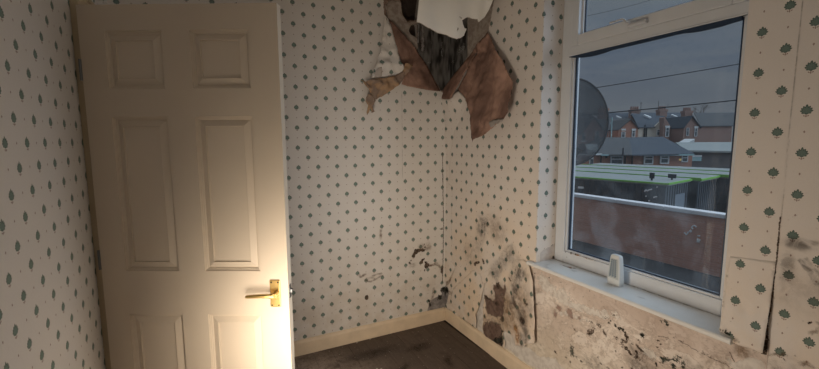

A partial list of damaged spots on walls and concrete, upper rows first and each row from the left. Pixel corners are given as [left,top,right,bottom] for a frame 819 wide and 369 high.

flaking render [383,0,419,50]
flaking render [464,0,494,62]
damp [409,246,438,271]
damp [587,315,645,369]
flaking render [503,267,770,369]
damp [654,340,686,369]